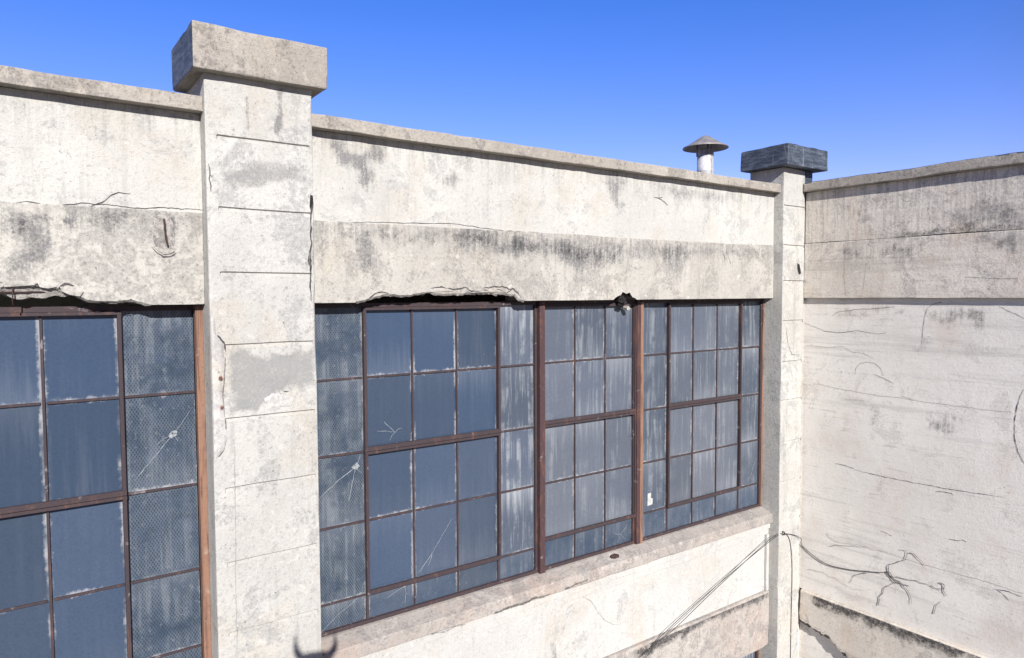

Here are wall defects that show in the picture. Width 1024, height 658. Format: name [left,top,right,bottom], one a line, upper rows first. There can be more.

crack [23,164,212,210]
damp [12,216,50,270]
damp [454,229,532,256]
damp [544,241,618,269]
crack [914,229,1024,237]
spalling [0,280,151,306]
spalling [355,286,524,304]
spalling [617,292,637,311]
crack [786,241,1024,461]
damp [814,597,980,658]